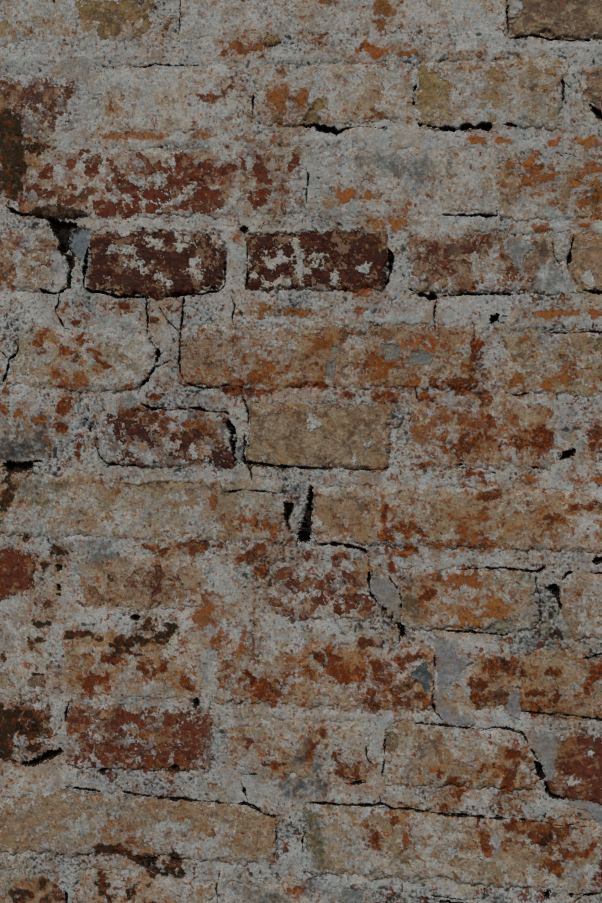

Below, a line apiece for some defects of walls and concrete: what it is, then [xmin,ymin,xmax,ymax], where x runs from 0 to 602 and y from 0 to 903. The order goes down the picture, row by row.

crack [1,341,19,383]
crack [39,223,388,493]
crack [437,628,508,636]
crack [414,656,602,760]
crack [309,737,590,827]
crack [424,886,485,903]